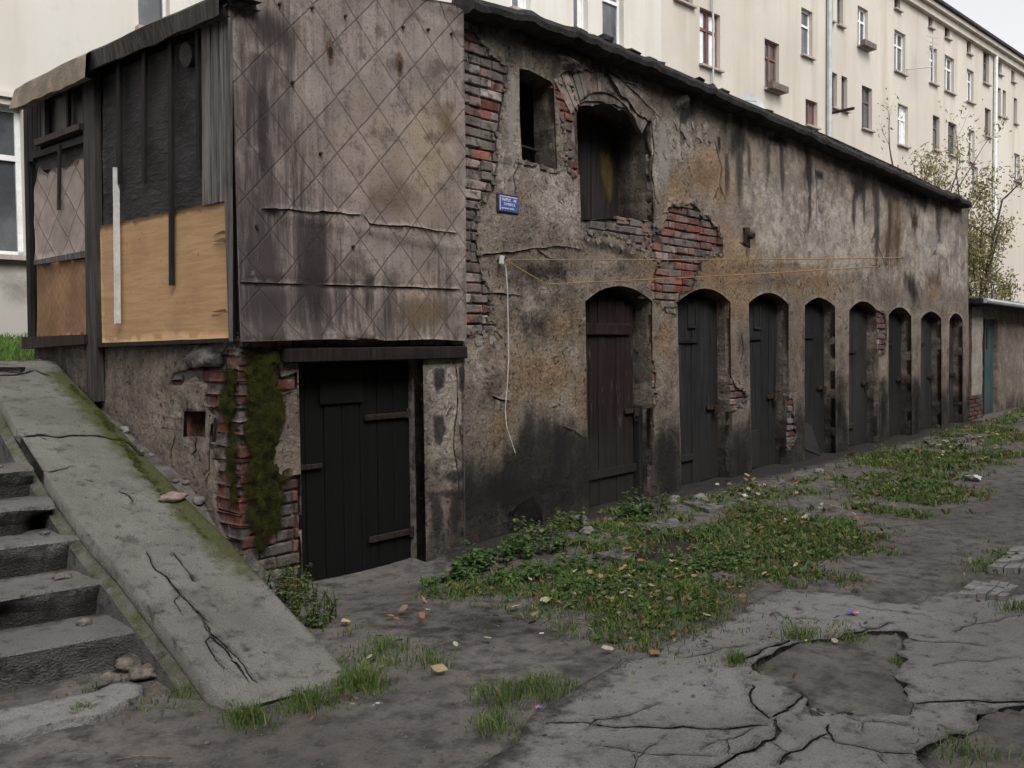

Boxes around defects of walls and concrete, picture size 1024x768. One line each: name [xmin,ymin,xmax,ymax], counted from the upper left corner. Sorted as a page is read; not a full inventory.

flaking render [464,21,512,353]
flaking render [545,60,648,201]
damp [717,121,751,199]
damp [767,133,786,186]
damp [806,152,823,222]
damp [852,176,943,252]
flaking render [580,201,724,314]
damp [904,274,918,303]
flaking render [871,309,888,355]
flaking render [172,342,299,590]
crack [146,553,252,680]
crack [718,687,854,768]